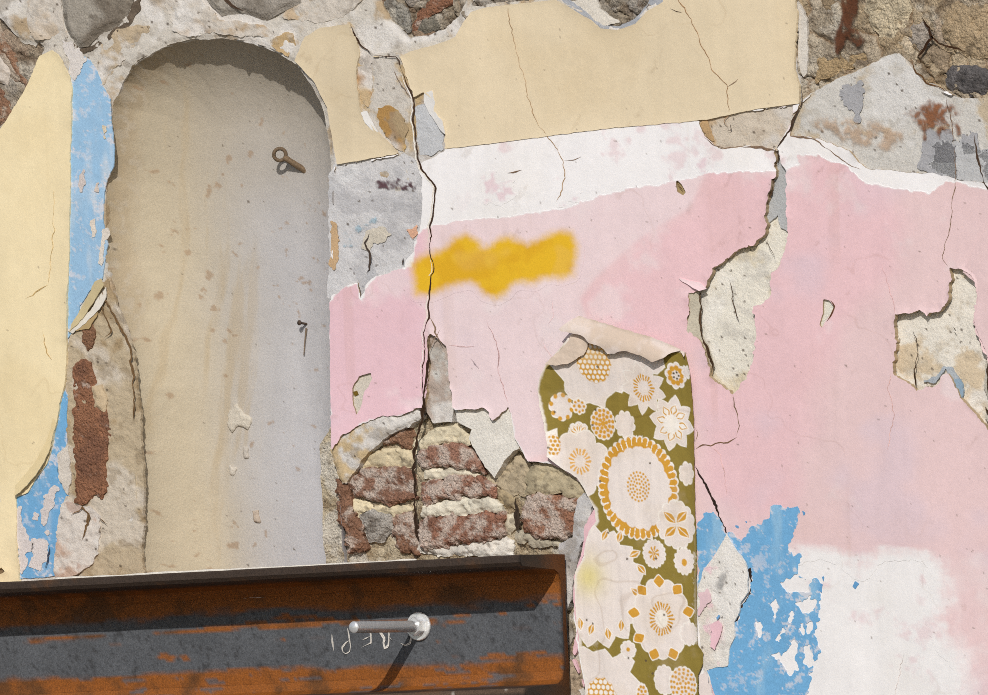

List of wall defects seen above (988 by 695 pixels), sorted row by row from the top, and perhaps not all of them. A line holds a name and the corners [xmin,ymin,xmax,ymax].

spalling [0,0,150,579]
crack [351,27,507,399]
crack [507,3,580,198]
flaking render [677,0,988,432]
crack [942,98,988,357]
spalling [319,335,594,695]
peeling [696,505,824,695]